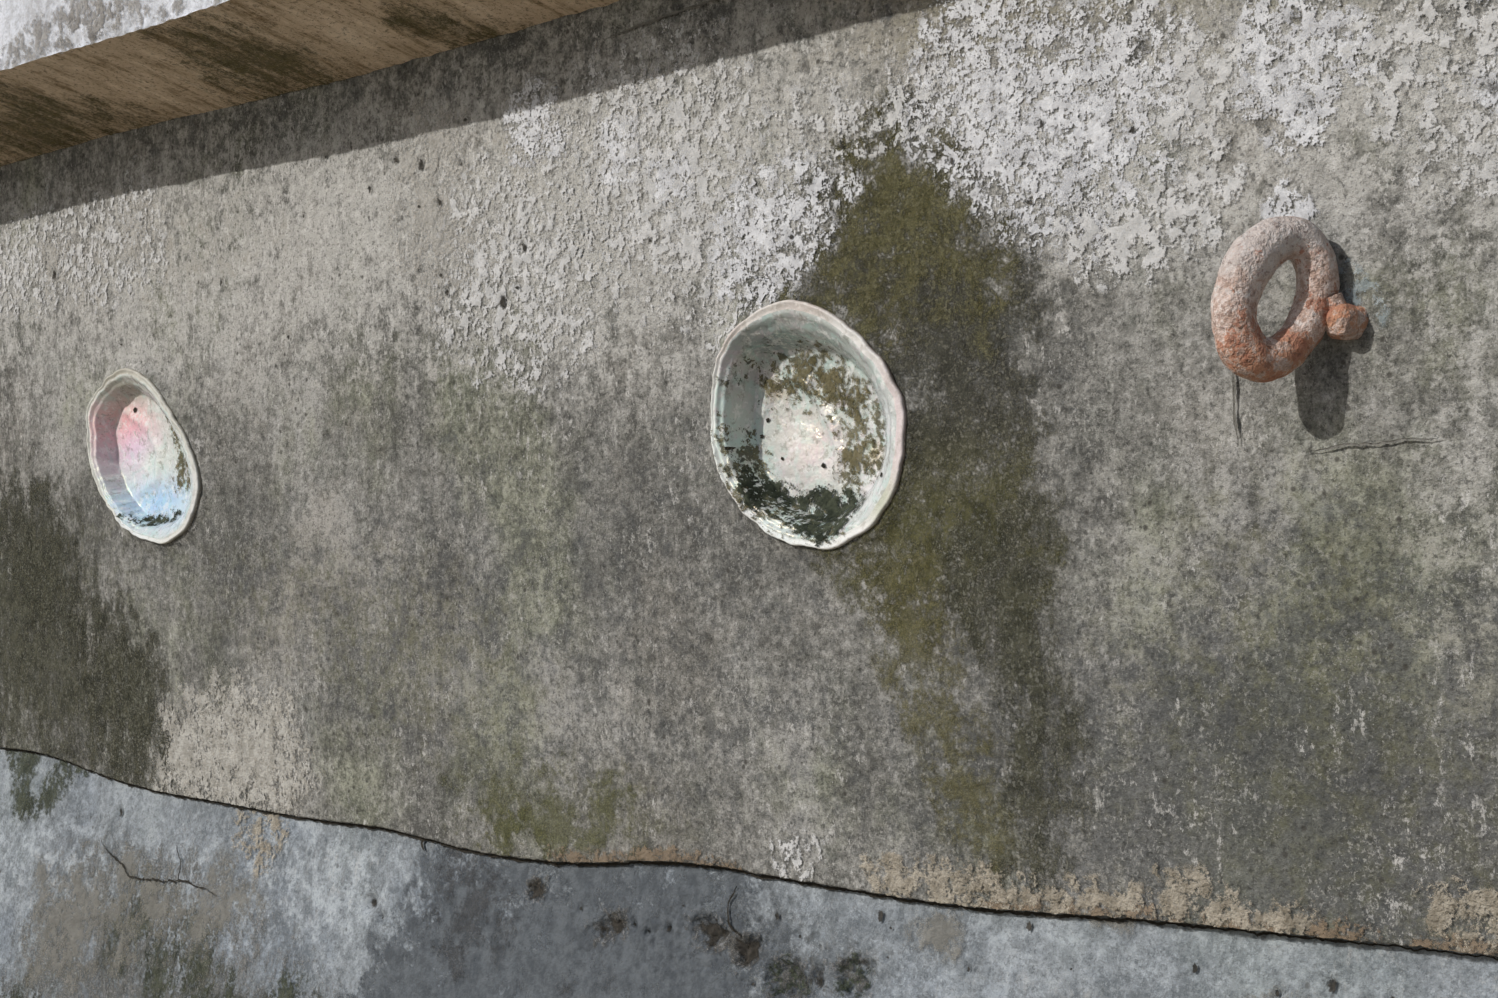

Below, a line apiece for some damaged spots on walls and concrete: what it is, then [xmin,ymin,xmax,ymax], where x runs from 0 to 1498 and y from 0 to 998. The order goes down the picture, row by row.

leakage [0,480,316,815]
leakage [856,490,1093,895]
crack [1,748,1498,961]
spalling [859,852,1317,935]
spalling [1415,876,1498,955]